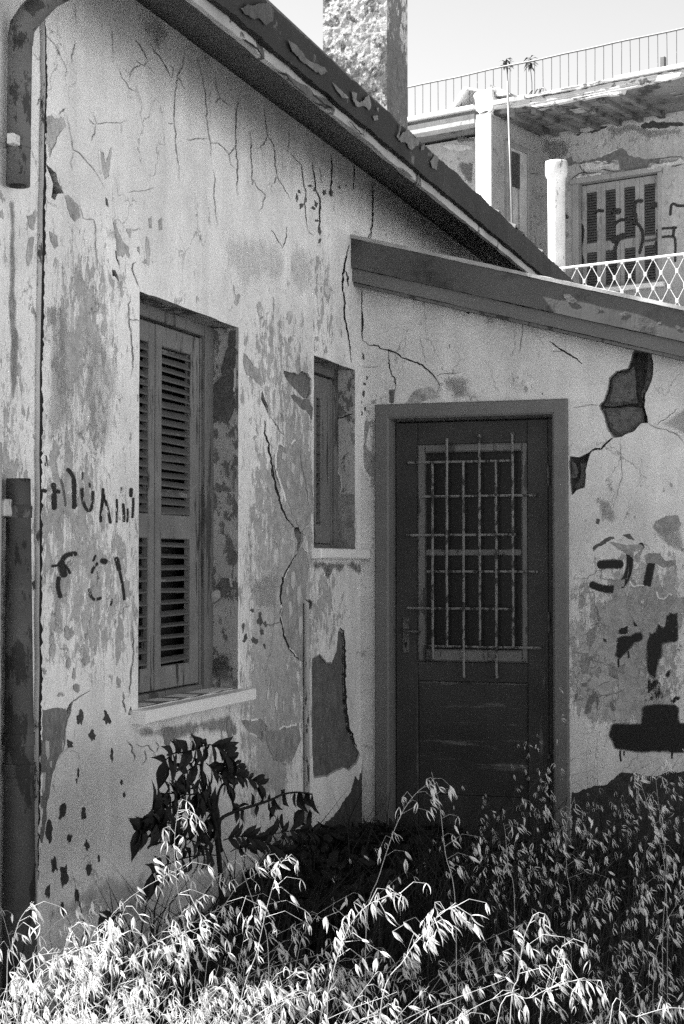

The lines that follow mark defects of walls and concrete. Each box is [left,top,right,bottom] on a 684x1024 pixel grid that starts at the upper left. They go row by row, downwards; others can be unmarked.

peeling [277,41,379,121]
crack [111,23,455,389]
spalling [283,370,313,419]
crack [551,342,582,364]
spalling [599,350,653,438]
crack [264,417,308,527]
spalling [569,453,591,495]
crack [587,438,623,503]
peeling [593,515,681,568]
crack [267,554,301,661]
spalling [227,439,363,828]
peeling [575,606,625,714]